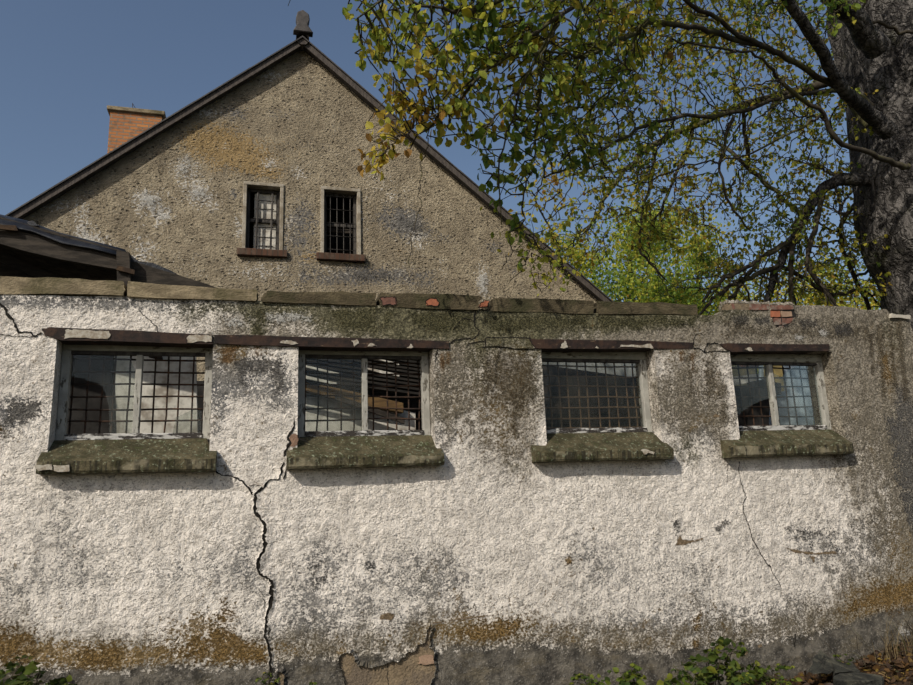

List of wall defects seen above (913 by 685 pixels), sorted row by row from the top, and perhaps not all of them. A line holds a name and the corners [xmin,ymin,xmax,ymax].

crack [0,303,46,338]
crack [425,298,535,362]
flaking render [718,299,798,331]
damp [0,396,47,437]
damp [884,380,913,534]
crack [212,420,309,685]
crack [727,447,782,597]
flaking render [334,615,494,685]